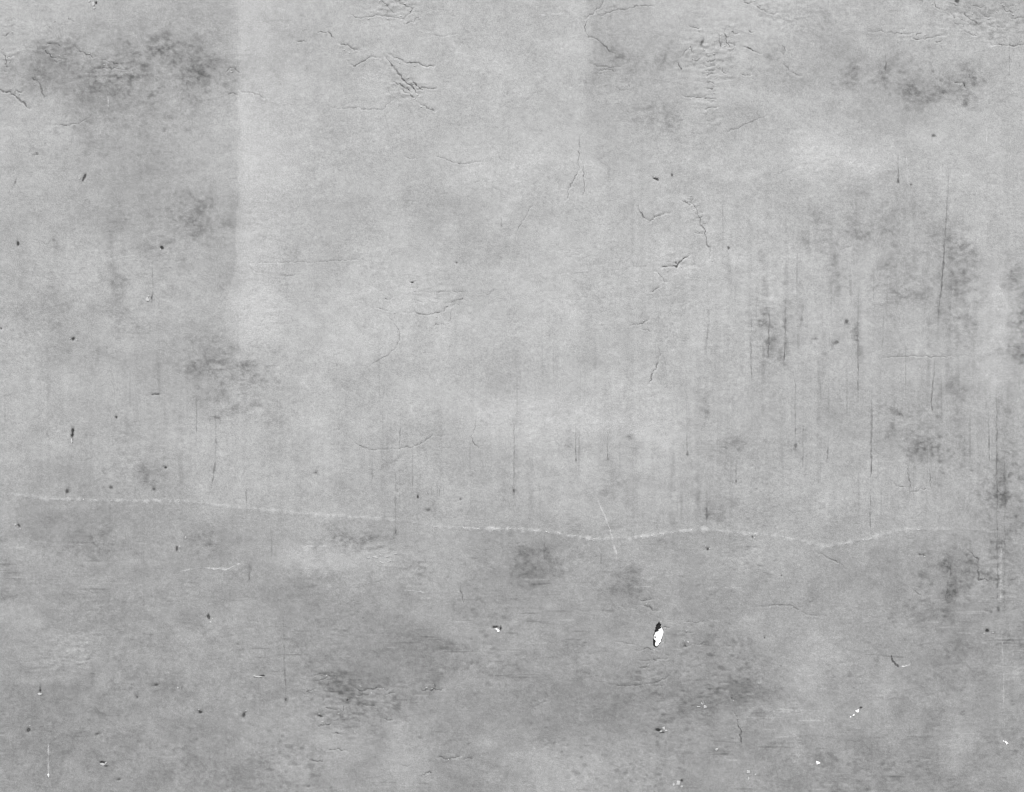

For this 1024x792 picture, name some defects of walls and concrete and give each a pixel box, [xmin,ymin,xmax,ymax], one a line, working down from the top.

flaking render [653,621,666,650]